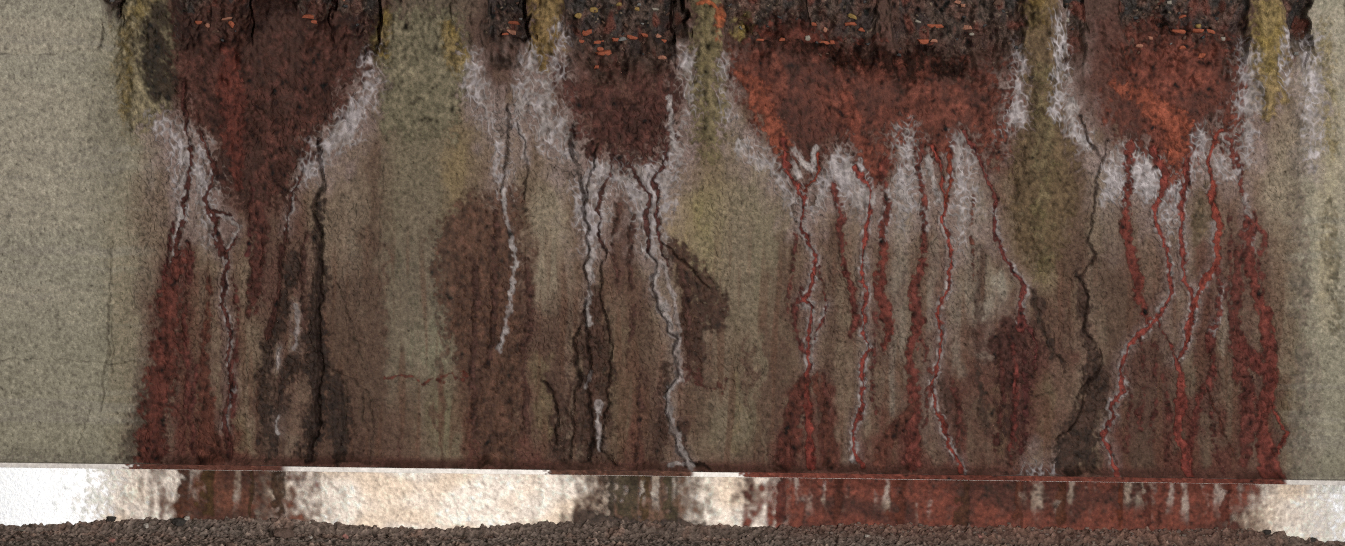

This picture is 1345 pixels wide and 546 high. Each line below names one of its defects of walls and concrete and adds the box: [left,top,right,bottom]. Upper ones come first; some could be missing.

damp [74,379,196,522]
corrosion [126,0,380,522]
damp [254,0,797,530]
crack [543,130,613,462]
spalling [562,0,689,69]
corrosion [553,64,728,394]
crack [648,245,710,470]
spalling [723,0,1026,76]
corrosion [728,0,1290,531]
crack [1062,115,1107,434]
damp [1100,1,1326,359]
spalling [1282,0,1311,55]